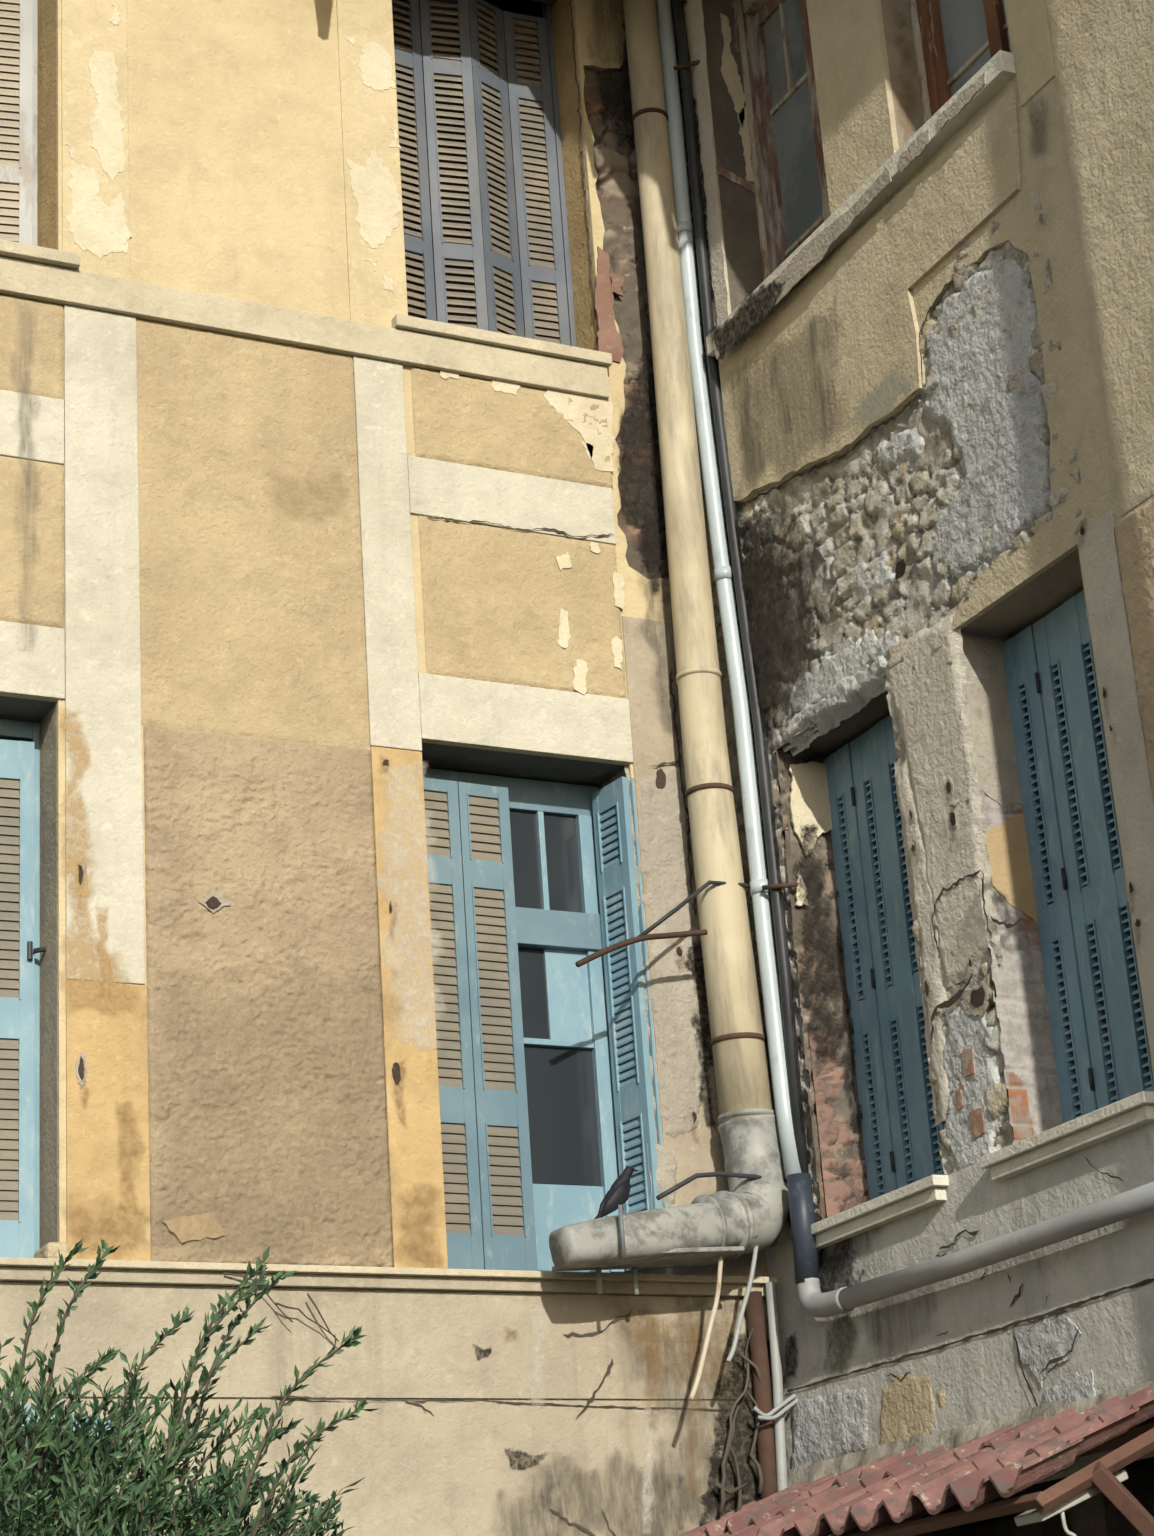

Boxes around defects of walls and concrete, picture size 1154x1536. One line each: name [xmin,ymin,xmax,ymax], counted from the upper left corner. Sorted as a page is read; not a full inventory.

peeling [346,36,395,92]
peeling [65,49,132,259]
peeling [346,128,402,293]
flaking render [543,0,669,610]
peeling [491,379,521,395]
peeling [557,608,588,695]
peeling [610,636,623,671]
flaking render [711,221,1086,1223]
flaking render [771,1211,792,1247]
crack [271,1310,723,1419]
crack [787,1229,1154,1406]